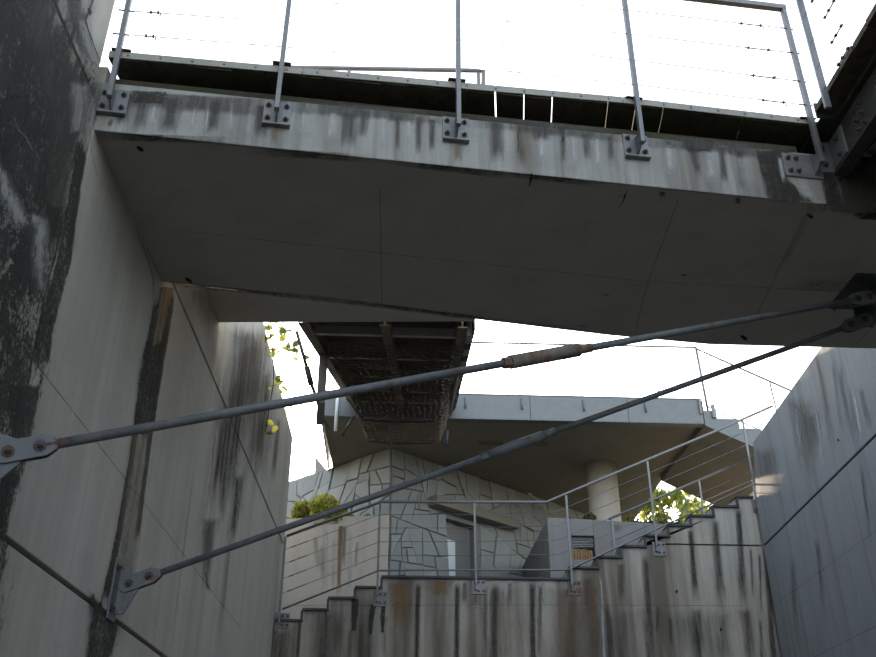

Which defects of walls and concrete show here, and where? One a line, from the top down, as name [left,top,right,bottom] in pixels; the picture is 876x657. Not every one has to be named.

damp [108,91,264,141]
damp [280,150,346,159]
damp [319,103,434,145]
damp [420,163,481,175]
damp [666,137,876,213]
damp [0,0,97,439]
damp [86,233,173,657]
damp [0,462,26,585]
damp [455,583,466,657]
damp [530,584,544,657]
damp [689,531,697,587]
damp [736,512,776,657]